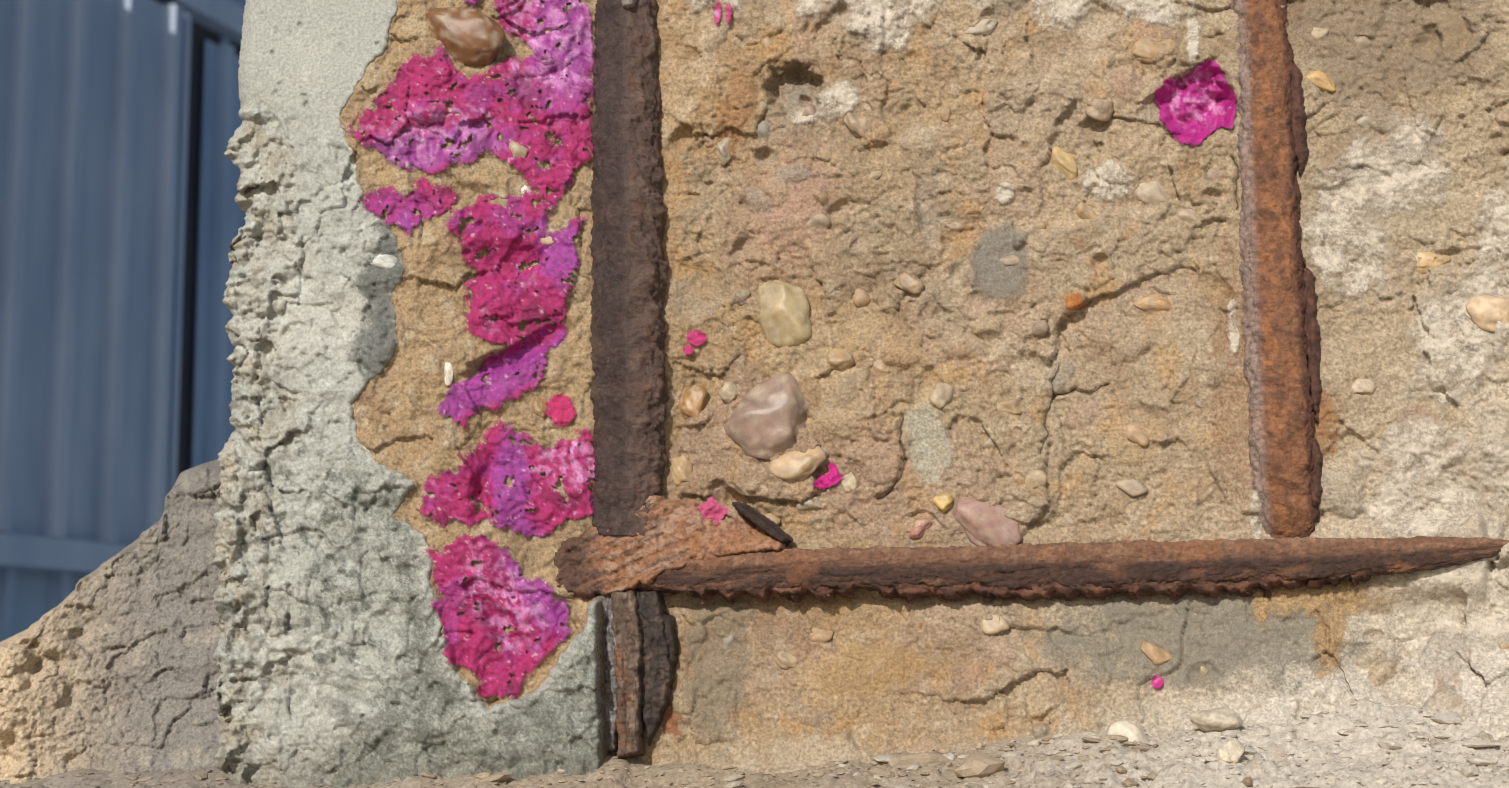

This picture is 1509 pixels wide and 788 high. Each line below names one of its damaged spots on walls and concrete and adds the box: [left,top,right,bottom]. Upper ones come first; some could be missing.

rust [1290,62,1309,176]
spalling [340,0,1509,773]
crack [1040,365,1109,454]
rust [1303,257,1341,507]
rust [554,494,793,759]
rust [692,570,1388,678]